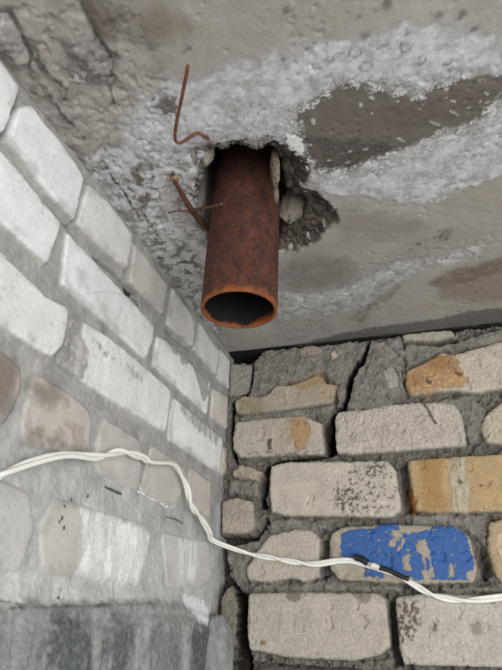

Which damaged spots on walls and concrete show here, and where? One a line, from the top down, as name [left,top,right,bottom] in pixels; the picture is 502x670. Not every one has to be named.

spalling [194,134,340,251]
leakage [84,22,502,347]
crack [262,342,371,510]
peeling [340,523,475,581]